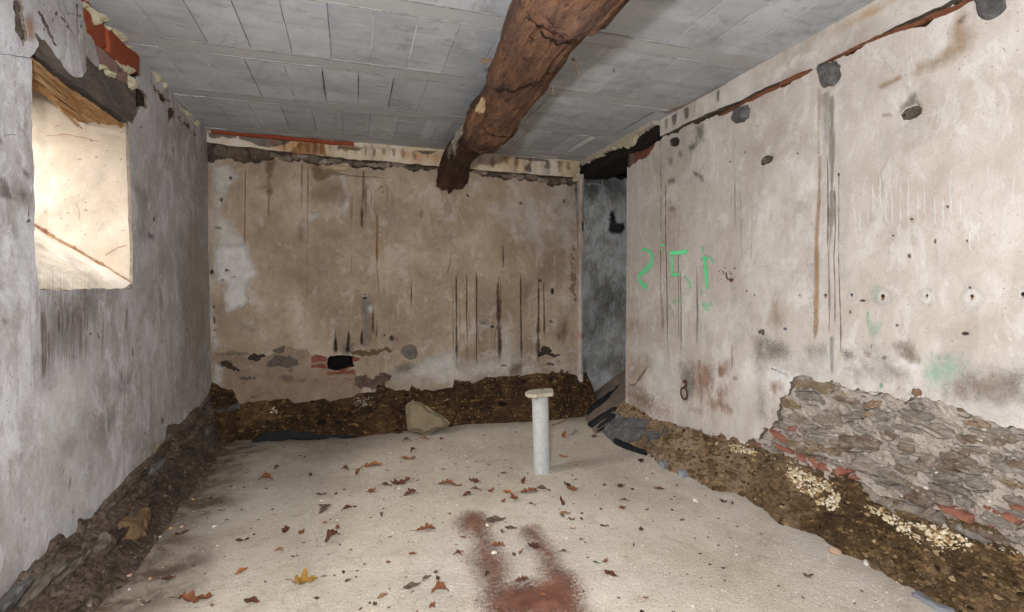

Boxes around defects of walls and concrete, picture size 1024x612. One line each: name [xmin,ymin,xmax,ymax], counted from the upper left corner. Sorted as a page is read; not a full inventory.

spalling [903,106,922,120]
water stain [814,129,885,358]
water stain [456,276,477,360]
water stain [512,278,522,373]
water stain [536,280,545,353]
spalling [220,345,393,396]
spalling [746,375,1024,565]